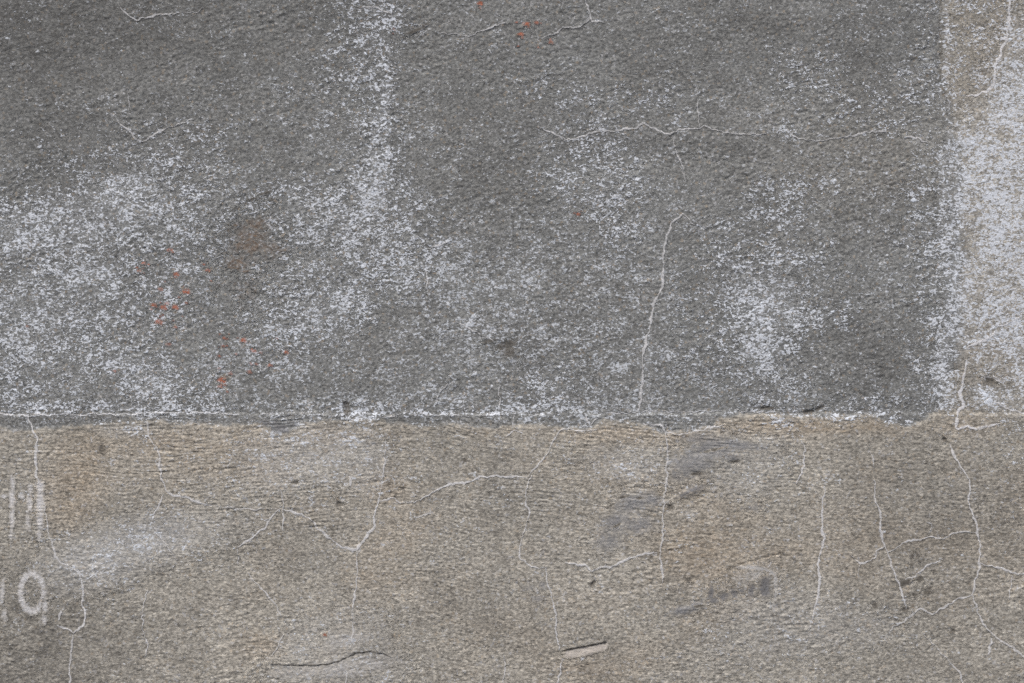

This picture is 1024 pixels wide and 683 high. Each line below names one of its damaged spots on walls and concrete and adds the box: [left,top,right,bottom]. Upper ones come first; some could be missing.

crack [966,0,1012,97]
corrosion [215,212,295,310]
crack [0,213,771,683]
crack [796,440,807,484]
crack [805,488,826,643]
crack [851,313,1024,683]